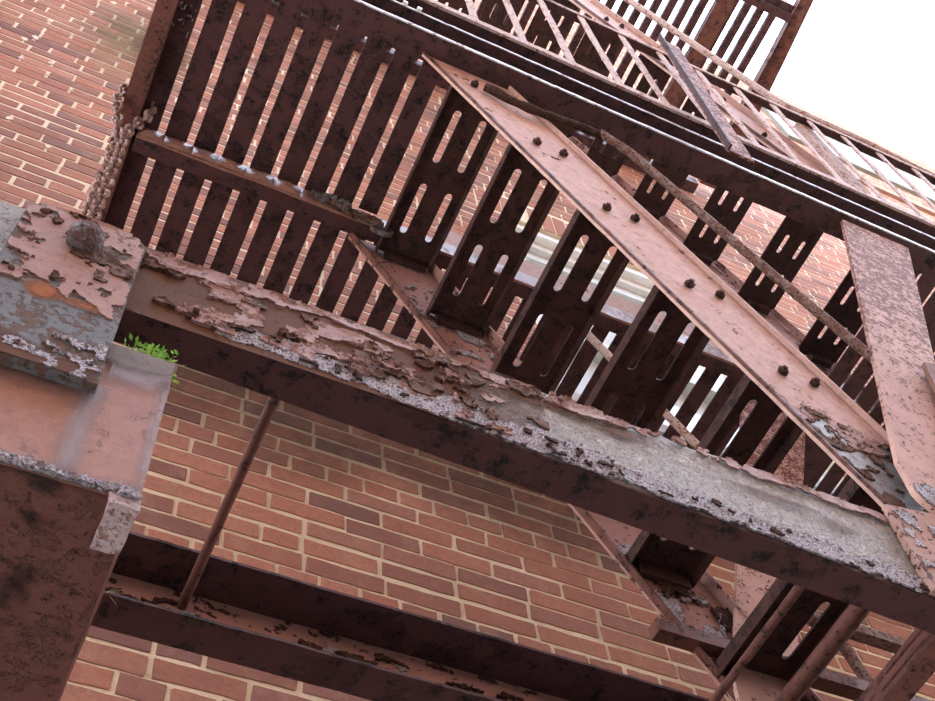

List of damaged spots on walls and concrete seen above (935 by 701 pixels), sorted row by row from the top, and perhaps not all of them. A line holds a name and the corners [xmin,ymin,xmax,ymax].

peeling [0,204,935,593]
peeling [618,544,733,639]